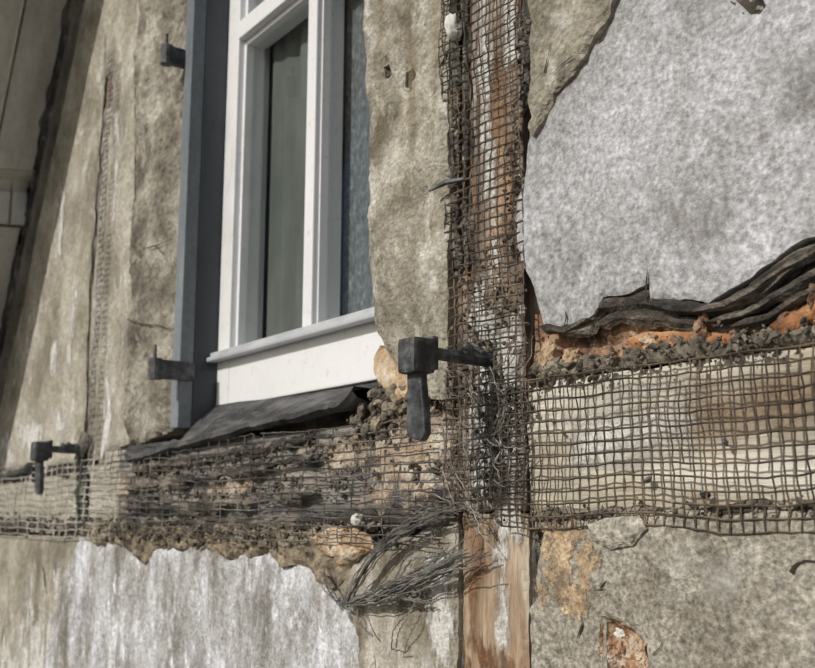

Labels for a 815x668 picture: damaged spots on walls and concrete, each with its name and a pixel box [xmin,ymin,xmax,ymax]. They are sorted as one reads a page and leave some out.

peeling [55,183,66,258]
rust [486,50,518,283]
spalling [515,0,815,375]
peeling [0,415,44,470]
peeling [50,288,78,375]
peeling [100,375,113,458]
spalling [374,345,407,400]
rust [738,381,810,428]
rust [466,523,485,620]
spalling [535,515,648,621]
rust [463,635,521,668]
spalling [598,618,650,668]